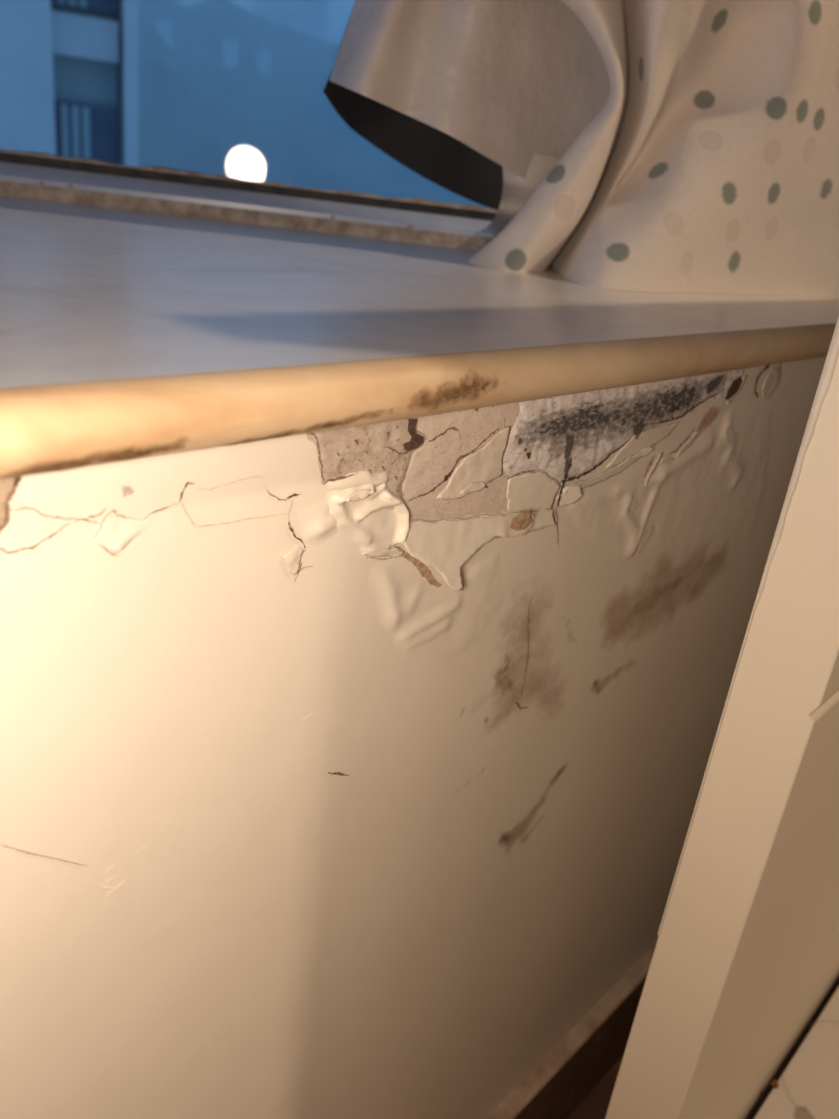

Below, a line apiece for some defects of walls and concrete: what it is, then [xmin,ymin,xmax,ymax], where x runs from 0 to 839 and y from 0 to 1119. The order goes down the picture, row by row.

leakage [529,375,724,476]
flaking render [0,477,21,531]
crack [0,495,106,554]
crack [144,476,300,527]
flaking render [284,363,782,591]
crack [555,458,572,547]
crack [641,429,701,487]